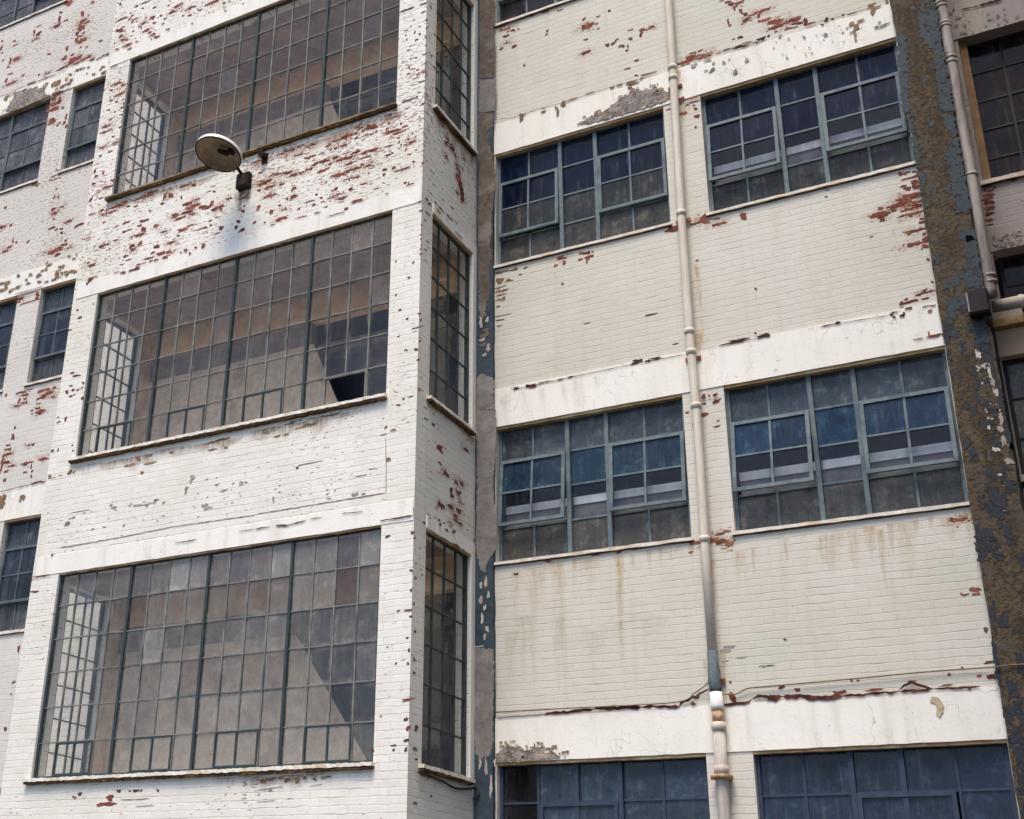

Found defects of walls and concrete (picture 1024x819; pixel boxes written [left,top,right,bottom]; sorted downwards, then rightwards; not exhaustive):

spalling [577,22,701,128]
peeling [719,0,890,59]
flaking render [0,0,527,357]
peeling [869,0,1024,568]
peeling [5,372,84,418]
peeling [0,426,74,508]
flaking render [391,373,569,802]
crack [496,681,980,719]